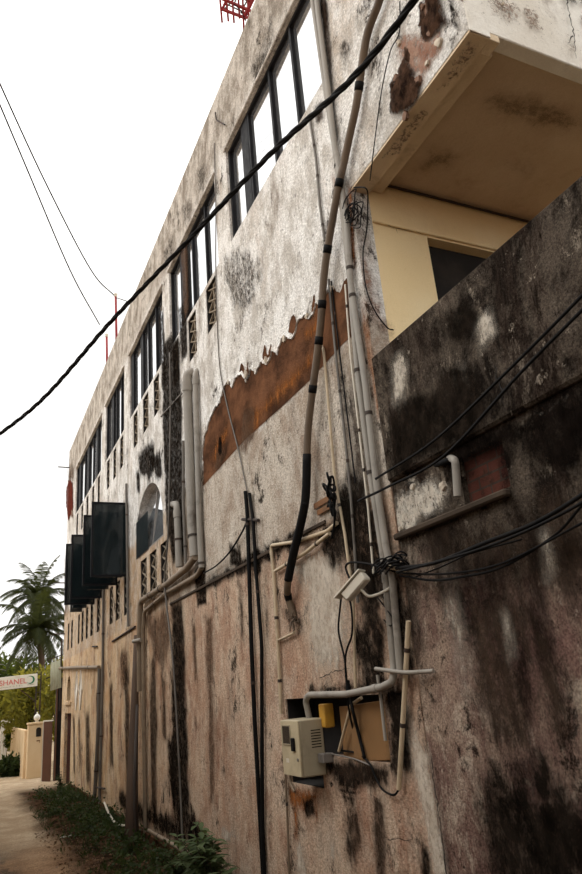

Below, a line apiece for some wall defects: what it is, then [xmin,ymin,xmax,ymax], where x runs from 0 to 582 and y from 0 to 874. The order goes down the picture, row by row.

crack [566,0,576,55]
water stain [159,249,188,562]
water stain [138,601,214,848]
water stain [194,530,306,607]
peeling [201,278,351,486]
water stain [284,385,445,874]
water stain [388,302,582,595]
water stain [451,592,582,874]